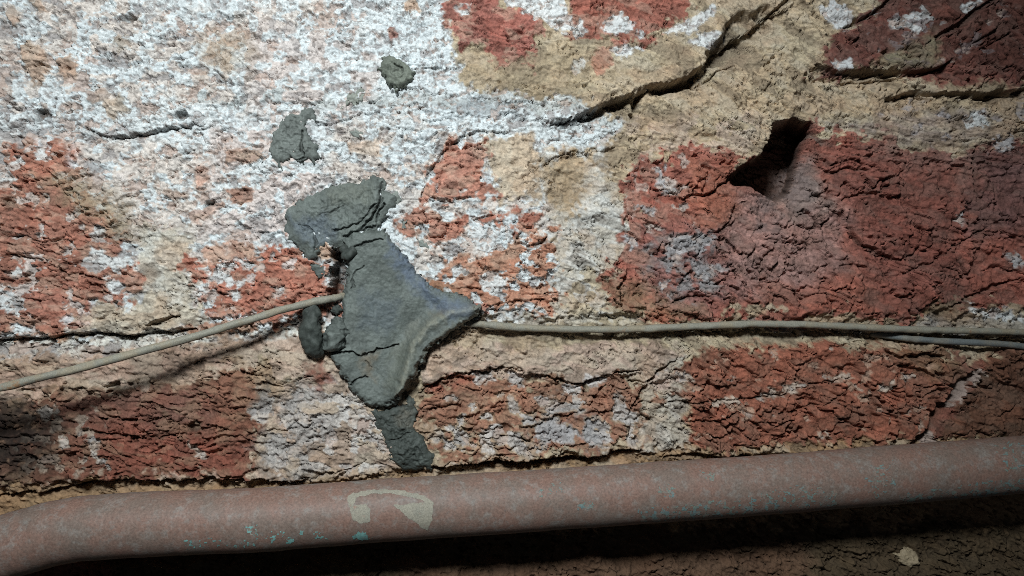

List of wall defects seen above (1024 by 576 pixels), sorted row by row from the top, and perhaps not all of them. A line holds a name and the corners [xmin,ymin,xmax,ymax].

peeling [436,0,645,69]
peeling [570,57,588,75]
peeling [664,3,725,51]
crack [815,0,1024,104]
peeling [0,139,145,338]
spalling [0,359,311,494]
spalling [343,406,382,444]
crack [418,359,678,410]
spalling [415,337,1024,467]